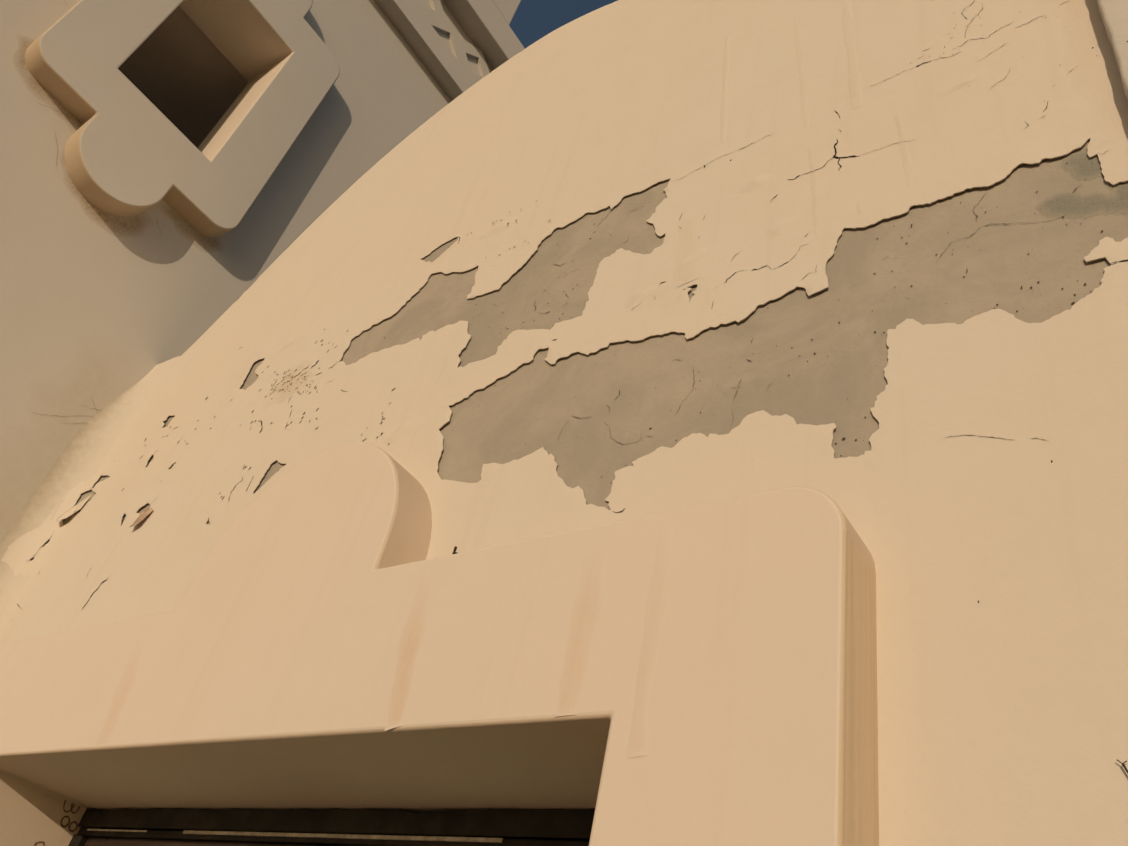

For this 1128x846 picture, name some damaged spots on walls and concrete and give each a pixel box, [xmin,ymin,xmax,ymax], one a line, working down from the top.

crack [867,0,1065,90]
crack [771,110,917,201]
peeling [341,139,1128,510]
peeling [231,358,266,400]
peeling [56,476,110,525]
peeling [122,504,153,527]
peeling [254,461,286,493]